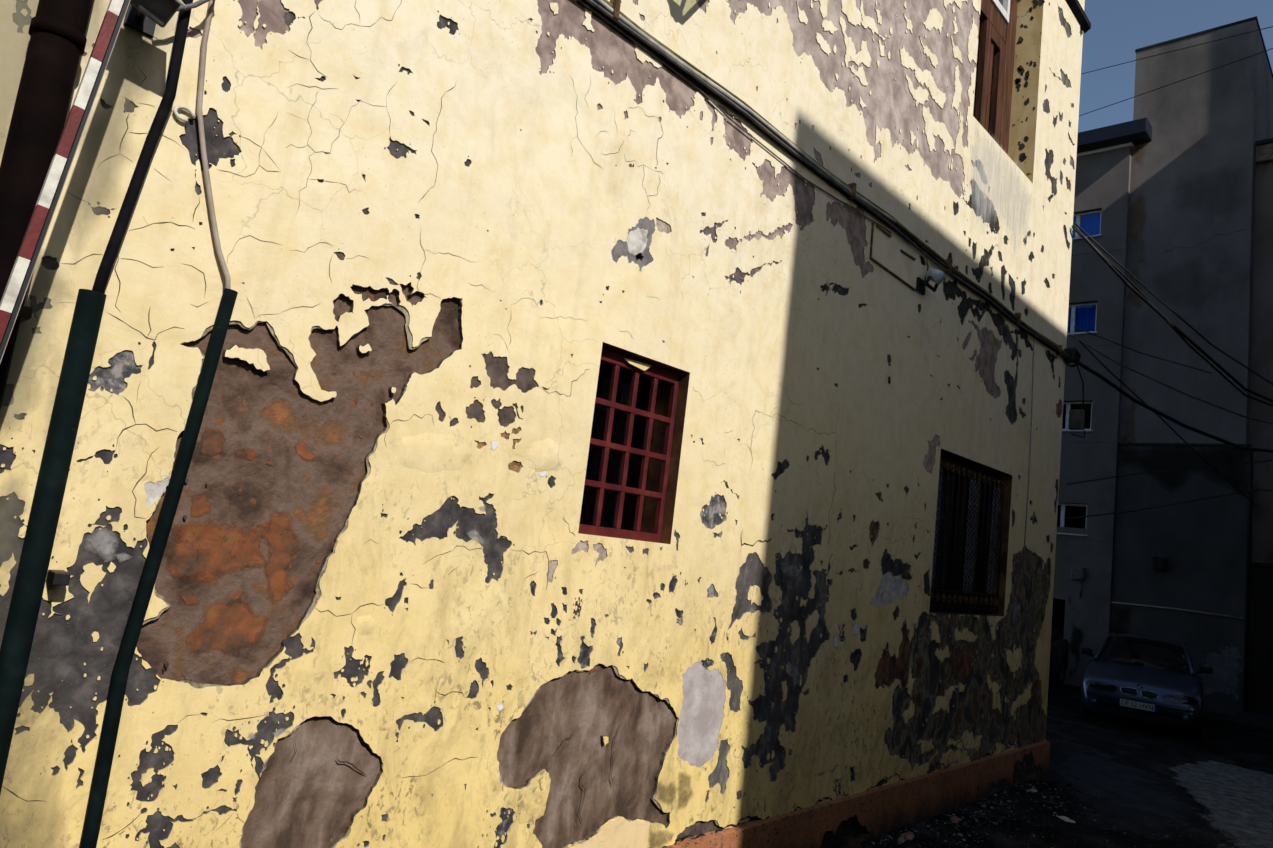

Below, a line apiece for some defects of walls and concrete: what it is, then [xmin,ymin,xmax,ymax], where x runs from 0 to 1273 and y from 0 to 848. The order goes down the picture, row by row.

crack [97,65,183,180]
crack [62,200,369,519]
flaking render [11,272,463,848]
crack [217,0,402,216]
crack [421,84,456,199]
crack [417,233,483,298]
peeling [399,493,515,586]
peeling [435,351,549,473]
flaking render [477,560,723,848]
peeling [528,0,874,278]
peeling [701,509,1054,824]
peeling [725,0,1063,425]